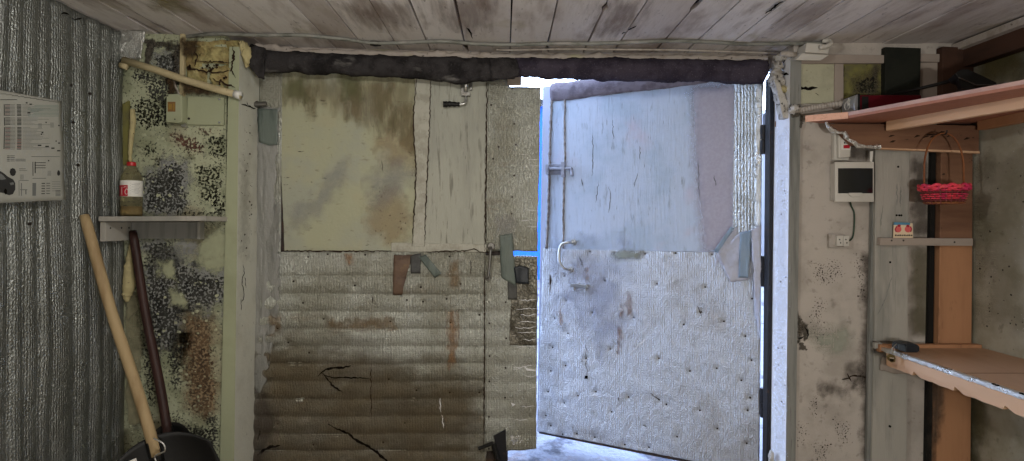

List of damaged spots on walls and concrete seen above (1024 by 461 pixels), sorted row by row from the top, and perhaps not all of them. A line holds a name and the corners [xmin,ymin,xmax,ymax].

damp [130,51,180,167]
spalling [143,37,240,96]
damp [178,134,227,225]
damp [140,252,224,455]
damp [847,257,869,384]